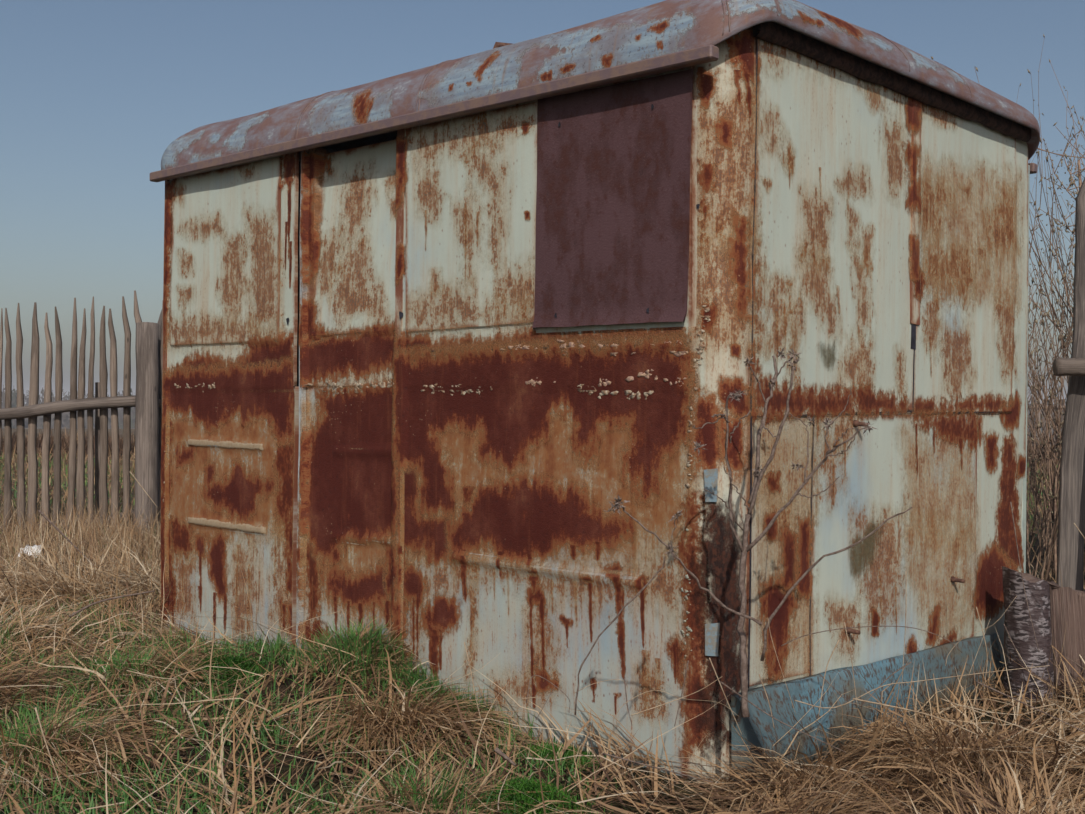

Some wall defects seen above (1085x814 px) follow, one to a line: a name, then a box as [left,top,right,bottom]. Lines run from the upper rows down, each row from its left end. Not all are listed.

rust [635,20,670,50]
rust [797,10,864,40]
peeling [420,384,492,396]
rust [161,28,1026,760]